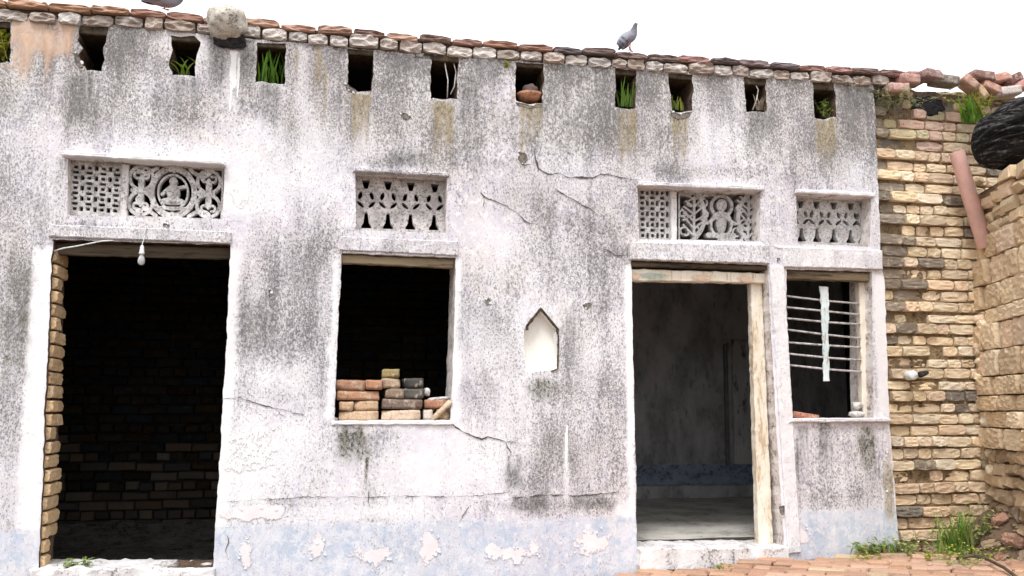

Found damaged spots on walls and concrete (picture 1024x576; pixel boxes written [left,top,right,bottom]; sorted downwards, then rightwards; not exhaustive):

damp [435,59,501,141]
crack [520,149,636,213]
crack [480,192,538,225]
crack [225,393,305,417]
damp [338,425,369,478]
crack [453,425,519,452]
peeling [349,546,397,568]
peeling [418,529,441,567]
peeling [484,539,541,565]
peeling [571,527,615,557]